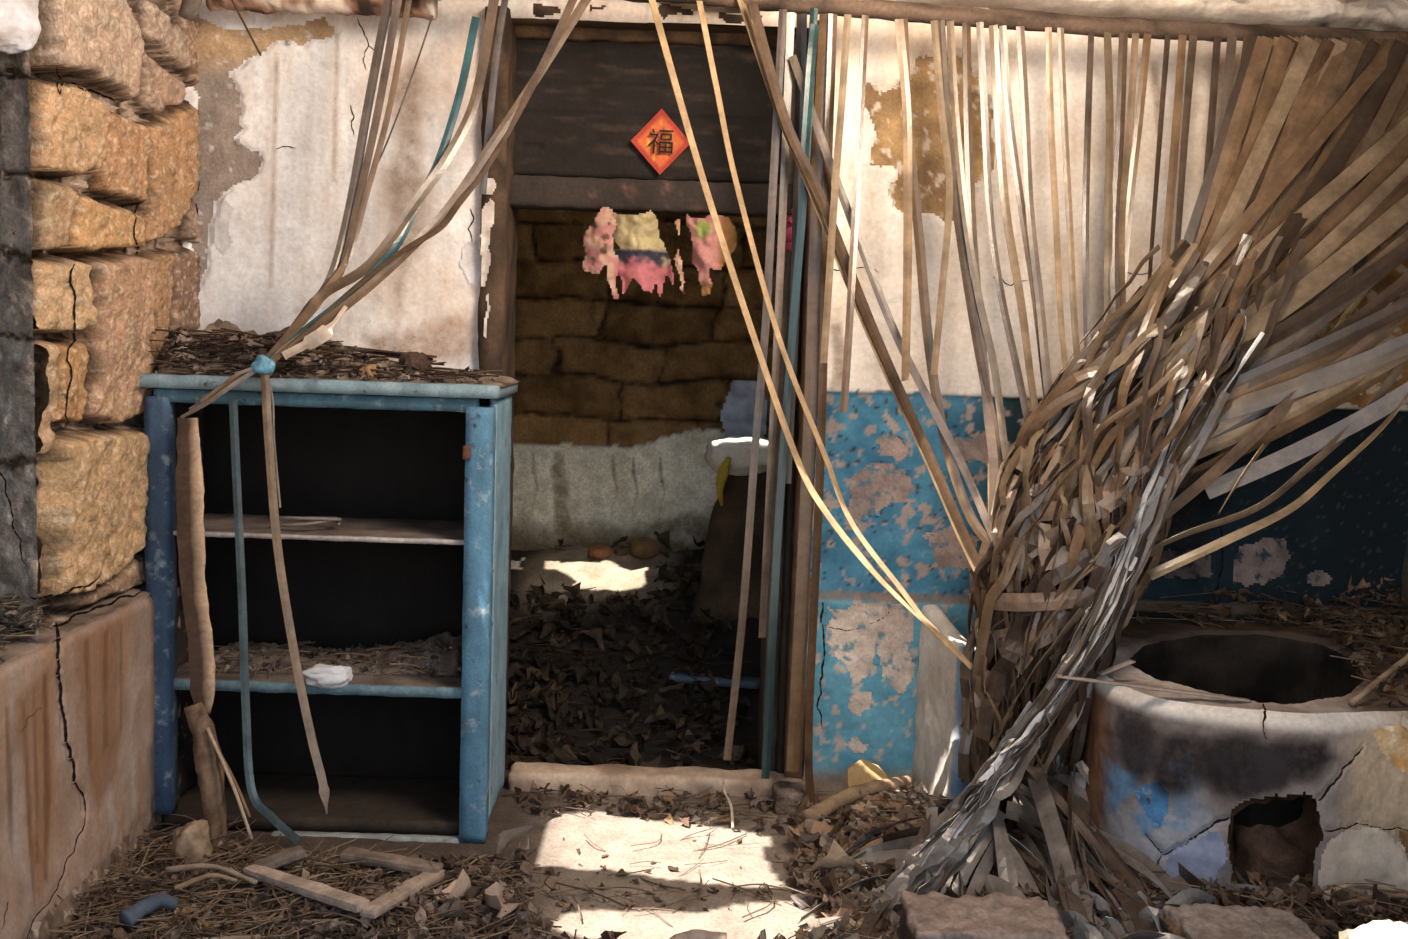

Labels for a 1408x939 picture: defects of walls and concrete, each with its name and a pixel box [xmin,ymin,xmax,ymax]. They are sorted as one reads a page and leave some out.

flaking render [192,13,335,279]
flaking render [865,51,995,222]
crack [65,264,76,425]
crack [0,472,25,564]
peeling [847,432,916,521]
peeling [1233,538,1291,587]
peeling [1307,570,1332,586]
peeling [824,603,916,716]
crack [1,576,144,939]
crack [1260,704,1268,739]
crack [1145,817,1229,865]
flaking render [1318,827,1408,896]